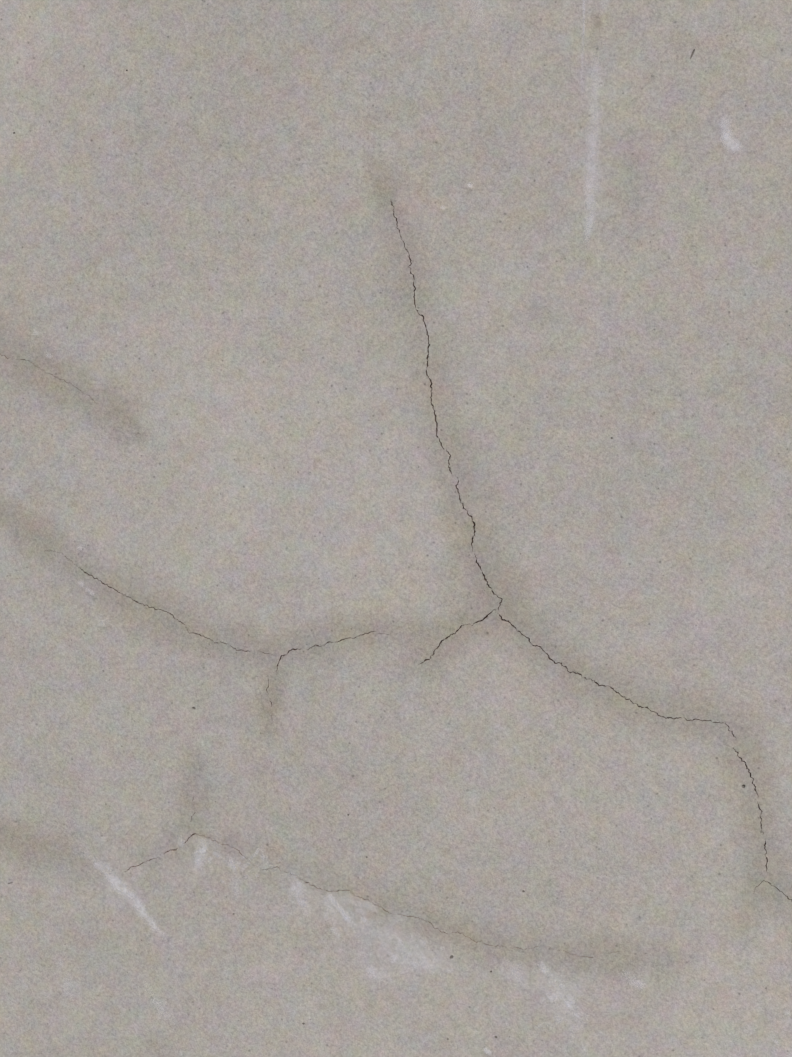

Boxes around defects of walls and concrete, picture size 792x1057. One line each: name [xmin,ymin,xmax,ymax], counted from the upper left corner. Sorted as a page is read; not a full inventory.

crack [47,550,388,718]
crack [390,199,792,901]